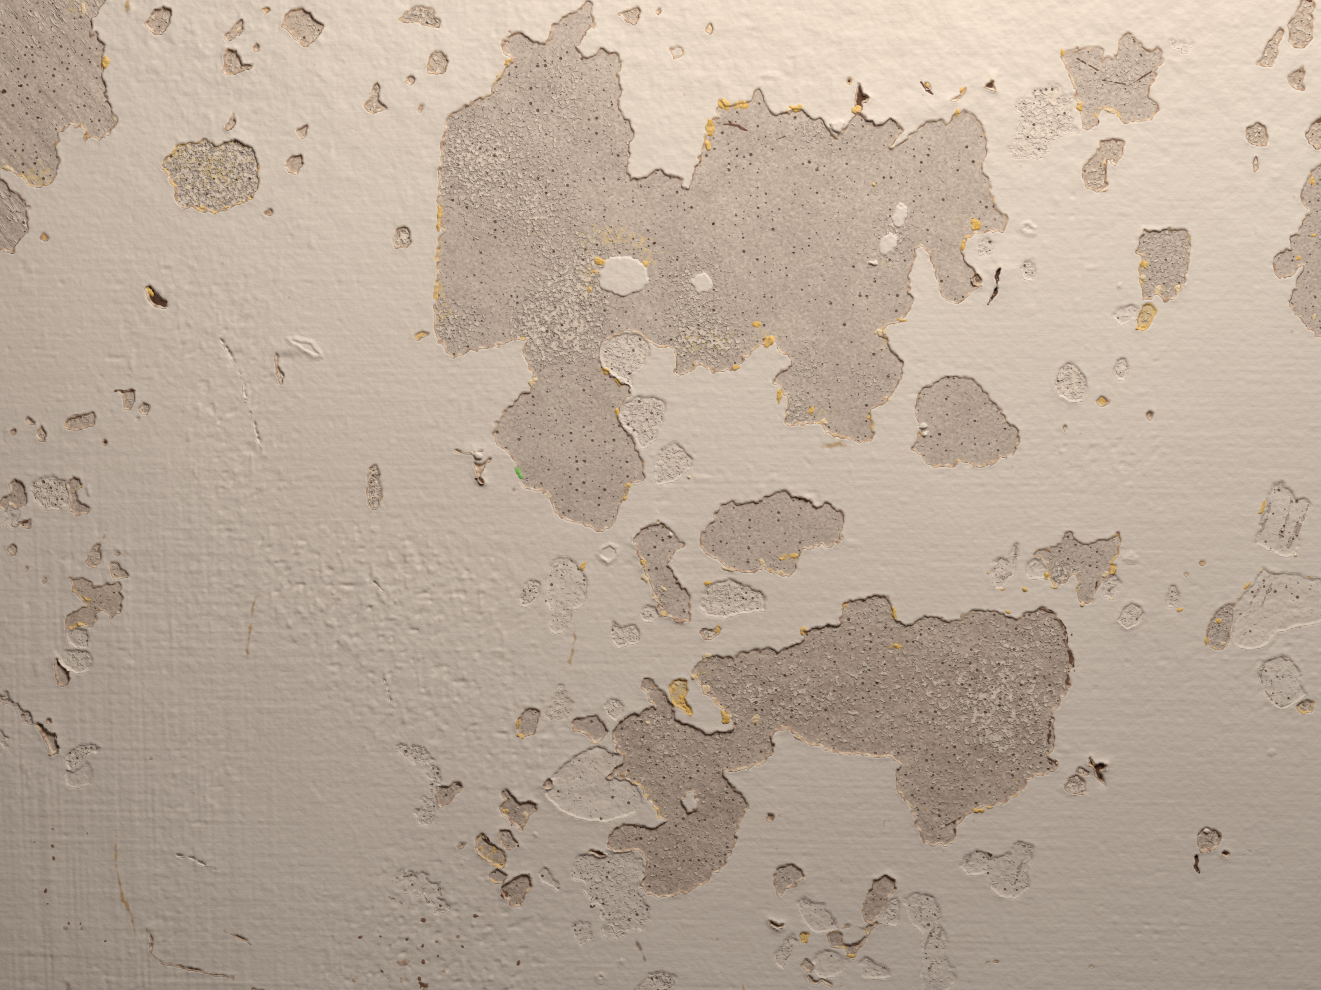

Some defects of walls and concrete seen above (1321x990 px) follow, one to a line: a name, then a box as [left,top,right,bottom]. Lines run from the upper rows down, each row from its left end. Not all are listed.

peeling [398,5,441,28]
peeling [0,0,118,253]
peeling [161,112,260,214]
peeling [414,0,1021,532]
peeling [1006,31,1195,192]
peeling [1111,227,1191,331]
peeling [1273,117,1321,337]
peeling [987,531,1145,630]
peeling [1205,481,1321,714]
peeling [0,690,102,788]
peeling [457,489,1108,946]
peeling [768,863,957,990]